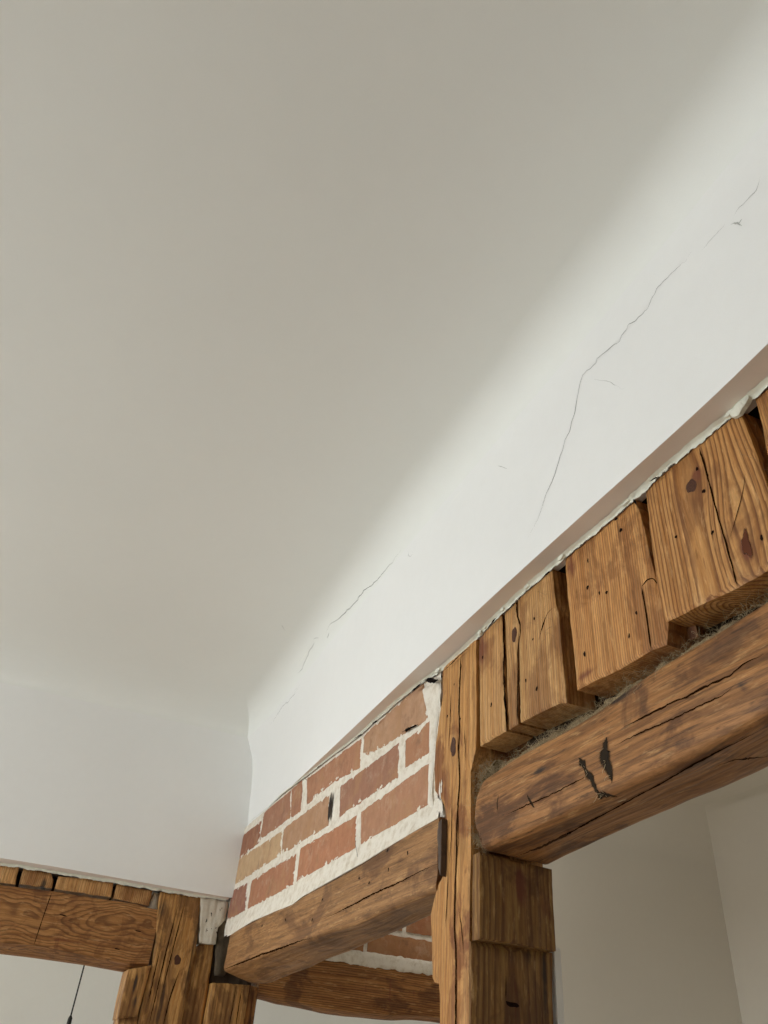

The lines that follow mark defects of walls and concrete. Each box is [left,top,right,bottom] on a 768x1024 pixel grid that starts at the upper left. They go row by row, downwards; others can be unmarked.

crack [699,449,745,587]